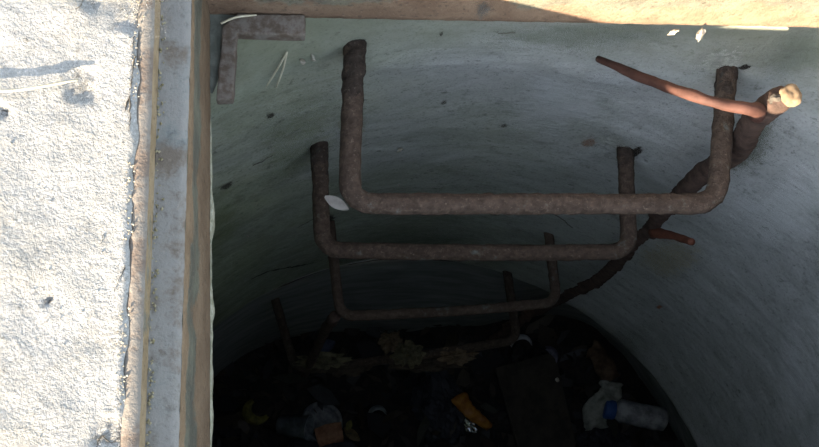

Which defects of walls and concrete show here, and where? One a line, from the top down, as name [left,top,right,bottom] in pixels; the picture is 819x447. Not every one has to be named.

corrosion [341,39,367,101]
corrosion [714,64,738,94]
corrosion [310,141,329,175]
corrosion [616,145,635,167]